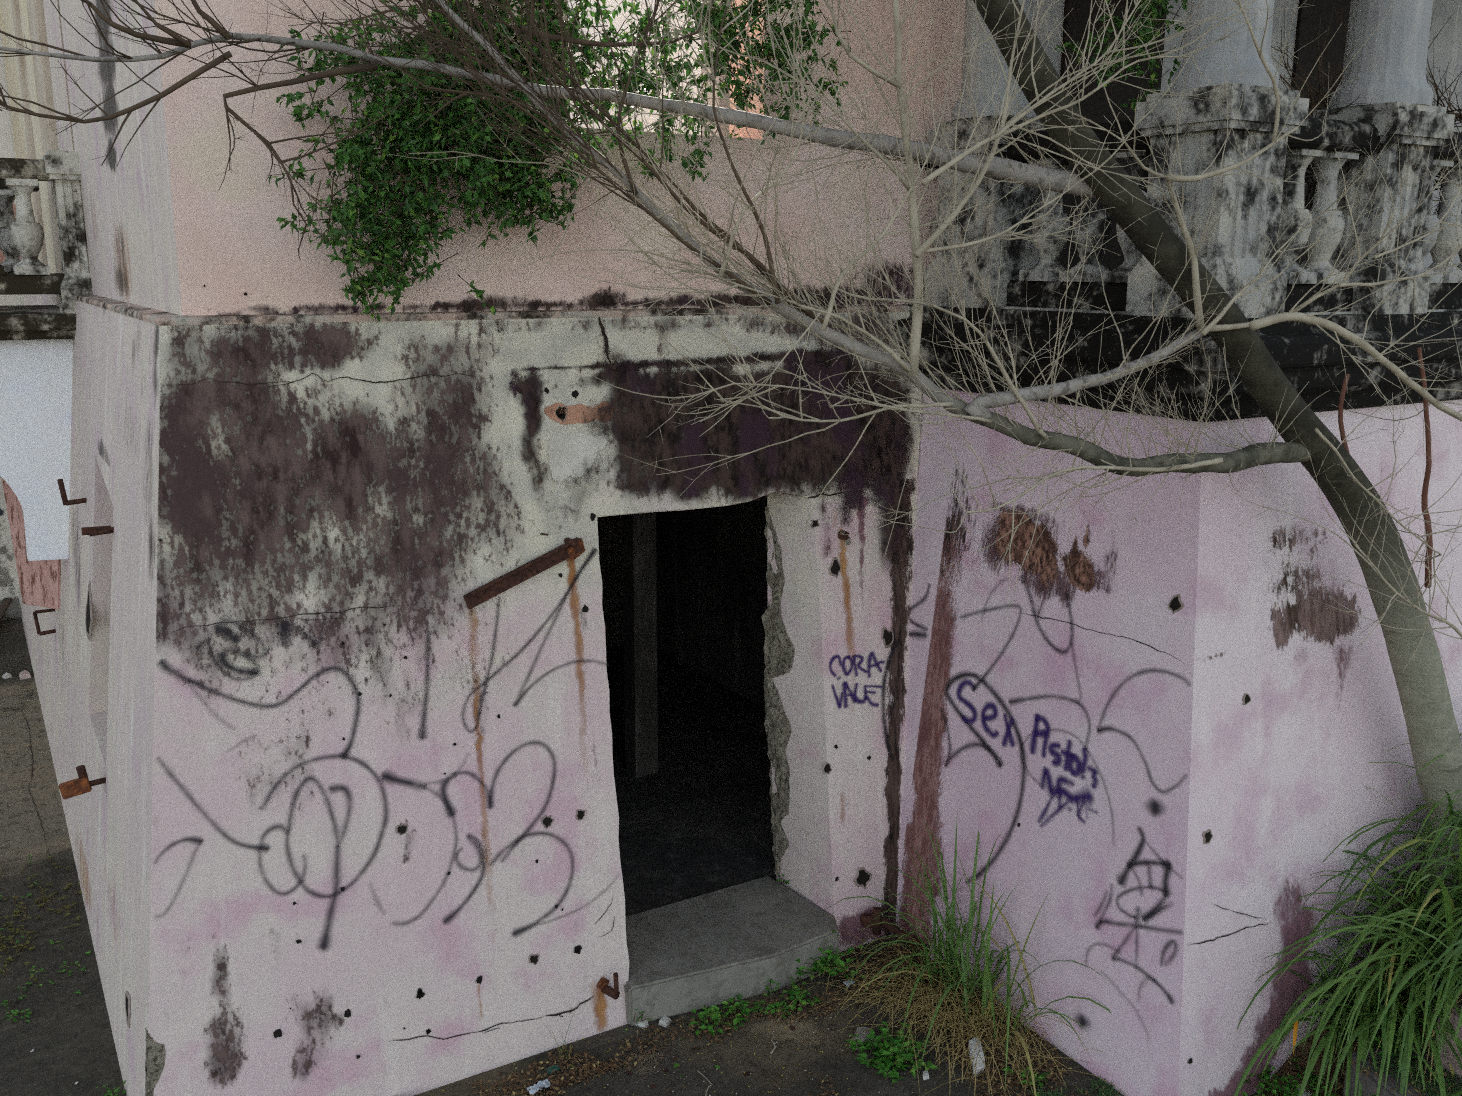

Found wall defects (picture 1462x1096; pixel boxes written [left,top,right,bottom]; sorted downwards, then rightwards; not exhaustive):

peeling [544,387,614,483]
corrosion [463,537,585,693]
damp [145,261,920,949]
corrosion [840,530,853,643]
spalling [994,509,1095,593]
spalling [1268,525,1361,651]
corrosion [474,689,486,818]
spalling [762,507,794,875]
spalling [125,991,166,1096]
mould [204,938,247,1088]
mould [291,991,344,1079]
crack [389,996,594,1042]